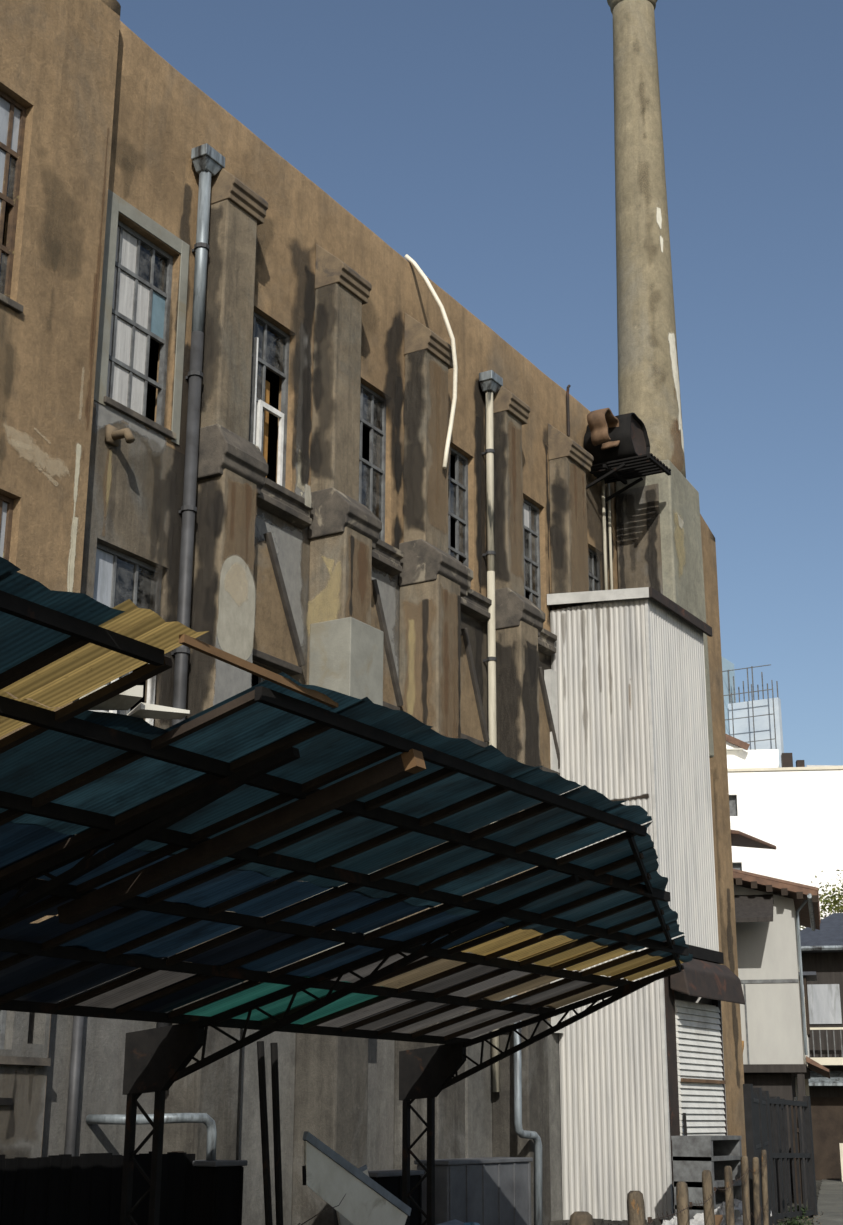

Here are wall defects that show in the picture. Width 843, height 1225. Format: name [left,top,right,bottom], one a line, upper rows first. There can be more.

water stain [292,268,327,484]
water stain [395,377,423,519]
peeling [668,333,684,452]
water stain [208,491,223,532]
water stain [606,494,637,589]